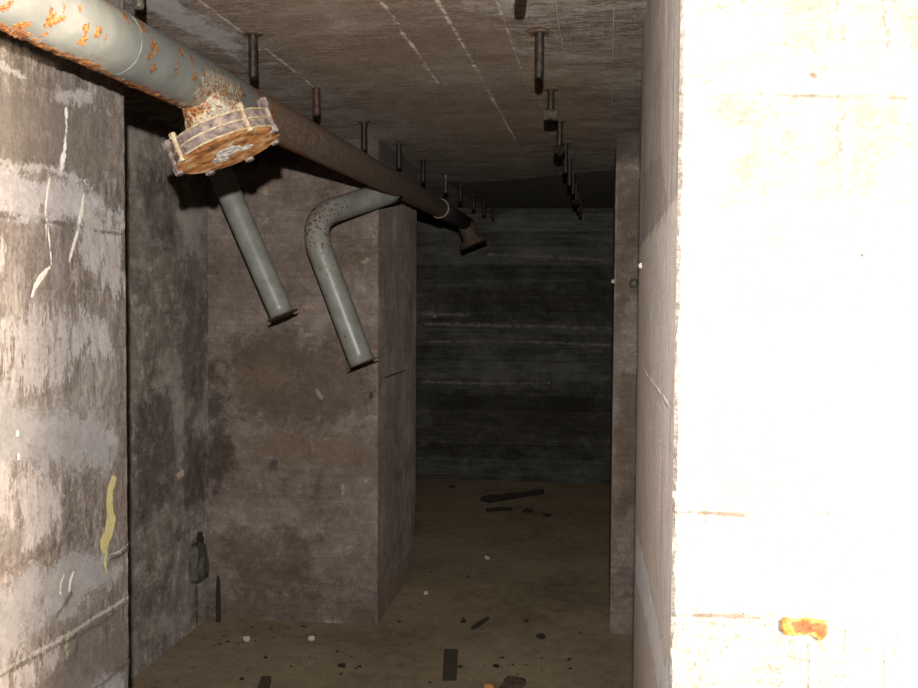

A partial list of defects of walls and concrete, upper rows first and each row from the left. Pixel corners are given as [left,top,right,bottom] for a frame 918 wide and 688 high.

corrosion [781,617,829,641]